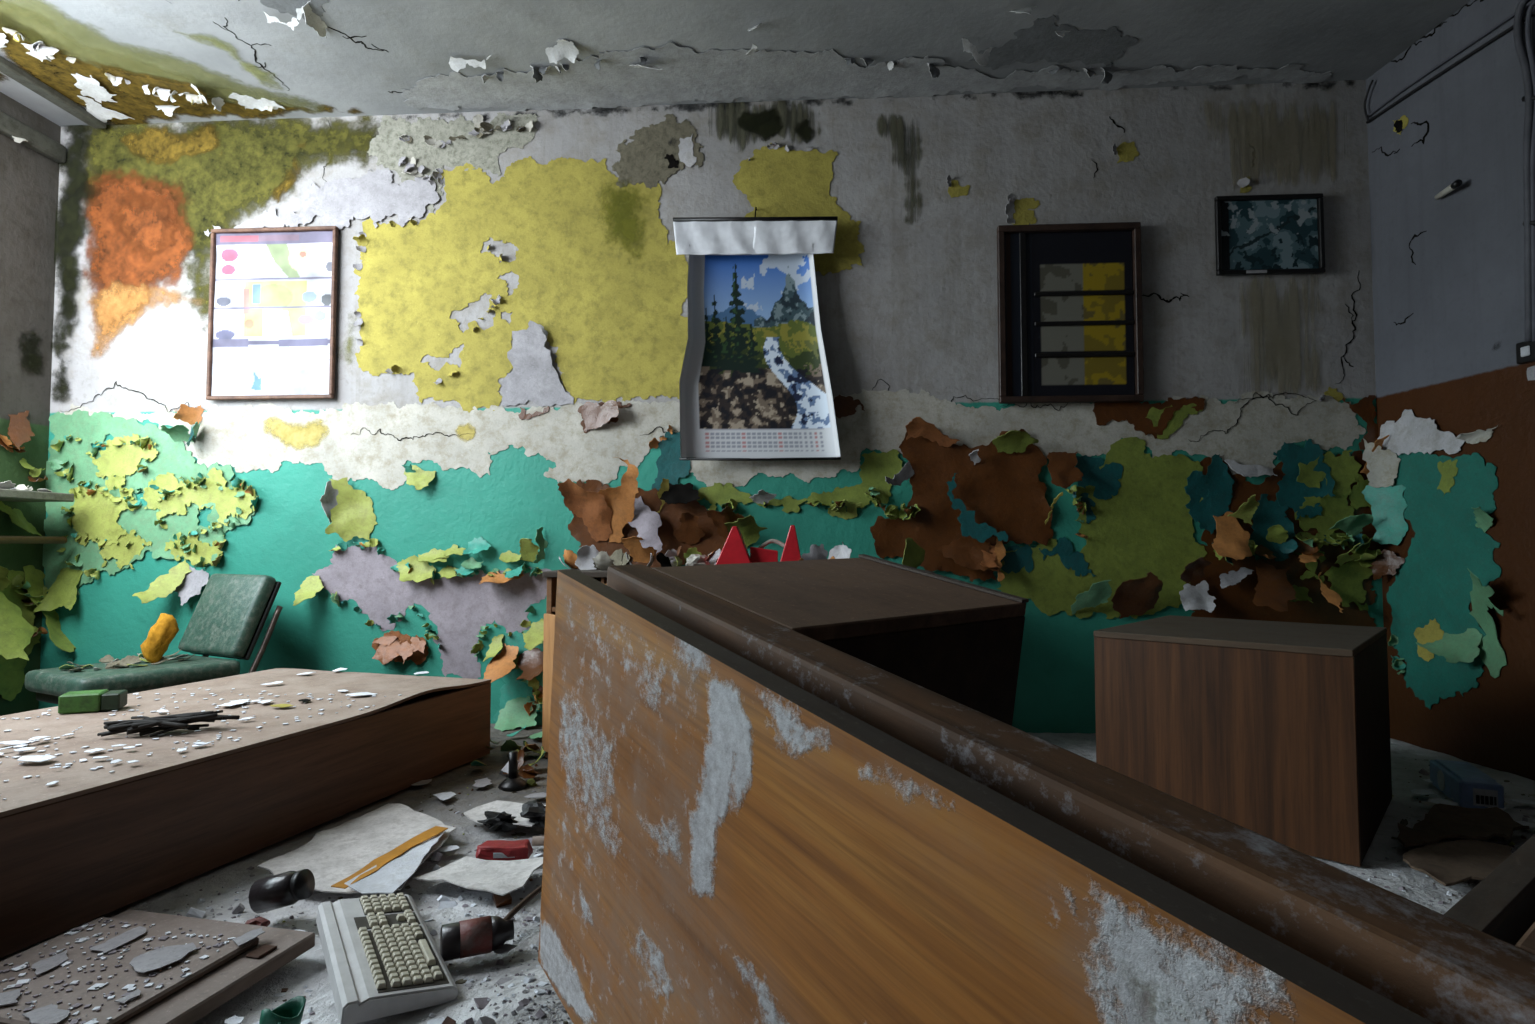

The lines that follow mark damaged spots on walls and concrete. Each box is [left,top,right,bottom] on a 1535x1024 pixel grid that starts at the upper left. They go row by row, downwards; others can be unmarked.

crack [215,0,290,91]
peeling [260,0,329,38]
crack [328,27,388,52]
leakage [678,99,814,149]
leakage [878,116,920,220]
peeling [0,6,1507,732]
crack [1336,273,1361,384]